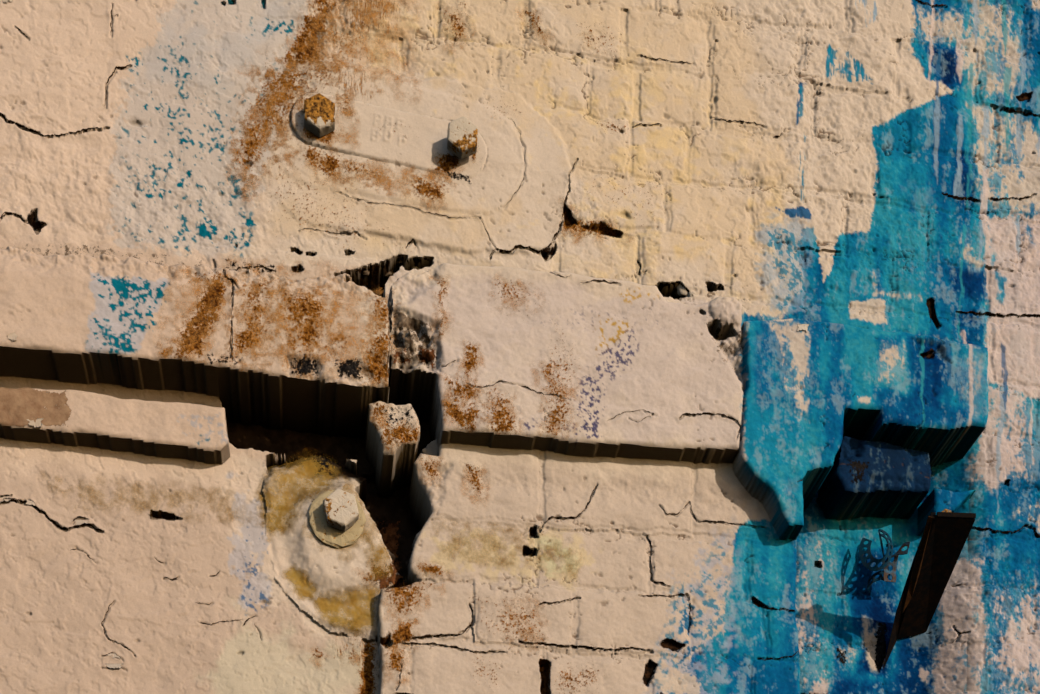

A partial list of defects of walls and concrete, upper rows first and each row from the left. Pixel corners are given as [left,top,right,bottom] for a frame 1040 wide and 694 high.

crack [0,64,131,138]
rust [234,0,459,246]
crack [335,160,641,284]
peeling [0,387,71,428]
rust [157,271,227,359]
peeling [335,358,363,380]
spalling [390,308,441,368]
rust [442,344,517,434]
crack [0,495,102,563]
water stain [259,457,350,532]
water stain [286,524,389,634]
rust [313,520,443,694]